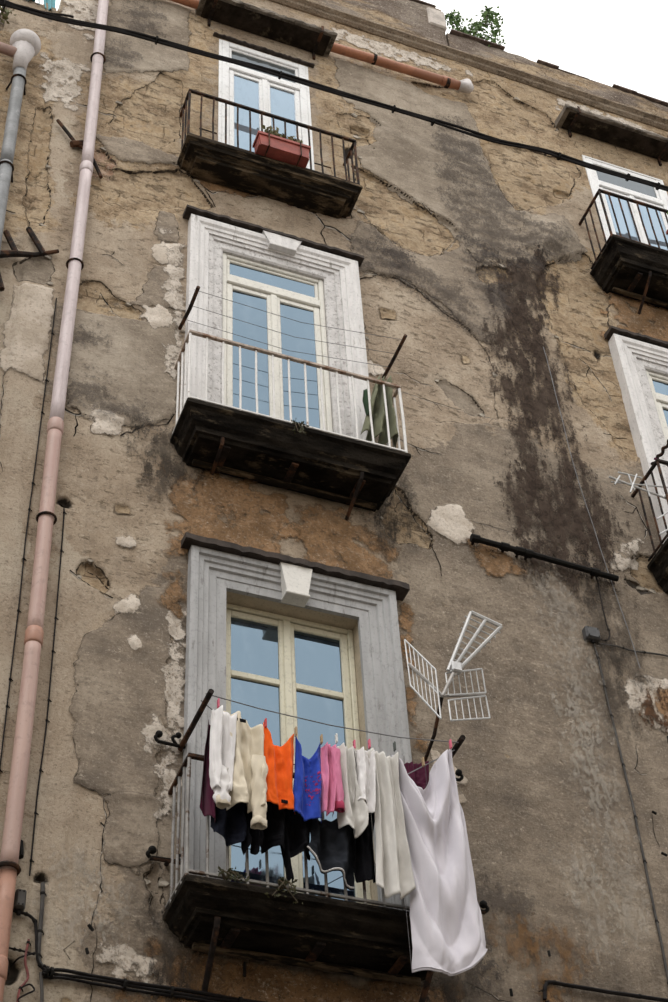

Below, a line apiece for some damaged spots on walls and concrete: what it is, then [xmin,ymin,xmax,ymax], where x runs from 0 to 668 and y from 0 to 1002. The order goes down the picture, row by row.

flaking render [22,52,91,226]
crack [311,212,351,245]
crack [356,184,455,257]
flaking render [76,280,142,321]
peeling [161,243,187,380]
flaking render [76,558,110,594]
peeling [140,606,187,819]
flaking render [143,861,170,923]
peeling [96,937,170,986]